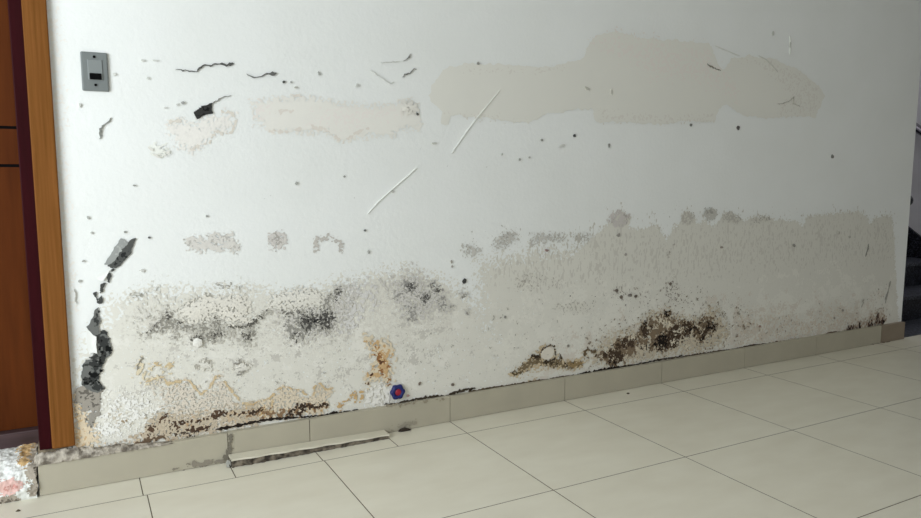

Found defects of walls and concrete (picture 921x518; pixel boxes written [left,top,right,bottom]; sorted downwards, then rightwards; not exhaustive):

crack [176,62,277,78]
peeling [429,26,825,127]
water stain [46,0,98,405]
flaking render [73,231,136,429]
corrosion [362,332,398,391]
water stain [73,202,902,448]